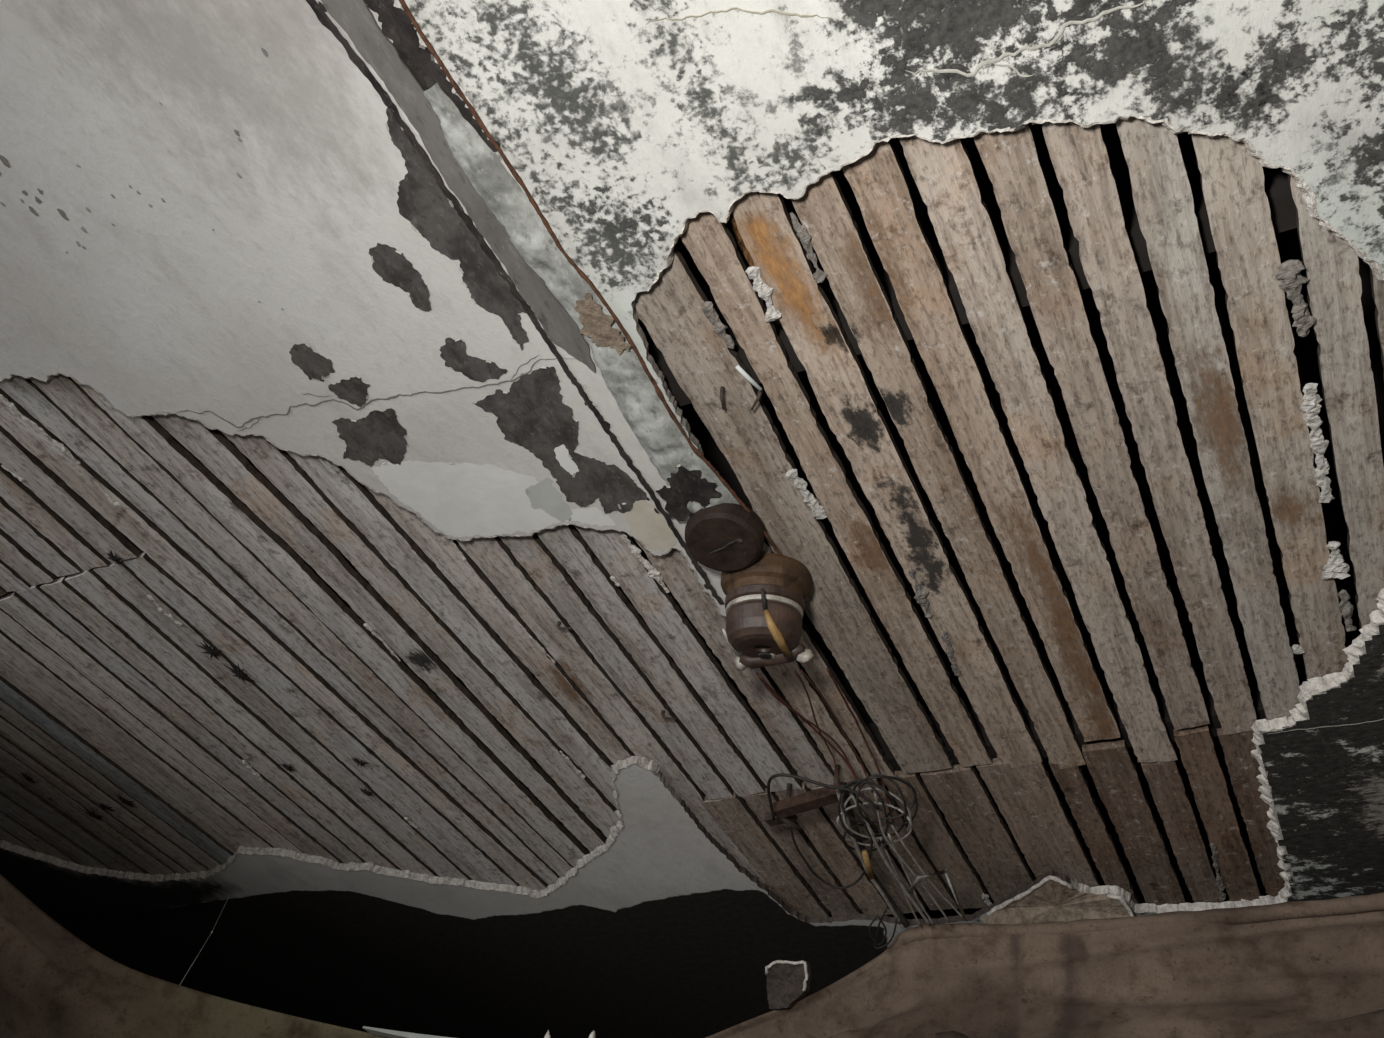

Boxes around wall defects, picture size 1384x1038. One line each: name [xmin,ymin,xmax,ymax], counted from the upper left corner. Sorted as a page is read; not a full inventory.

mould [410,0,678,291]
damp [628,0,1384,252]
crack [158,0,746,605]
spalling [0,107,1384,917]
damp [821,324,857,352]
damp [842,389,912,452]
damp [877,476,946,594]
damp [1258,625,1384,902]